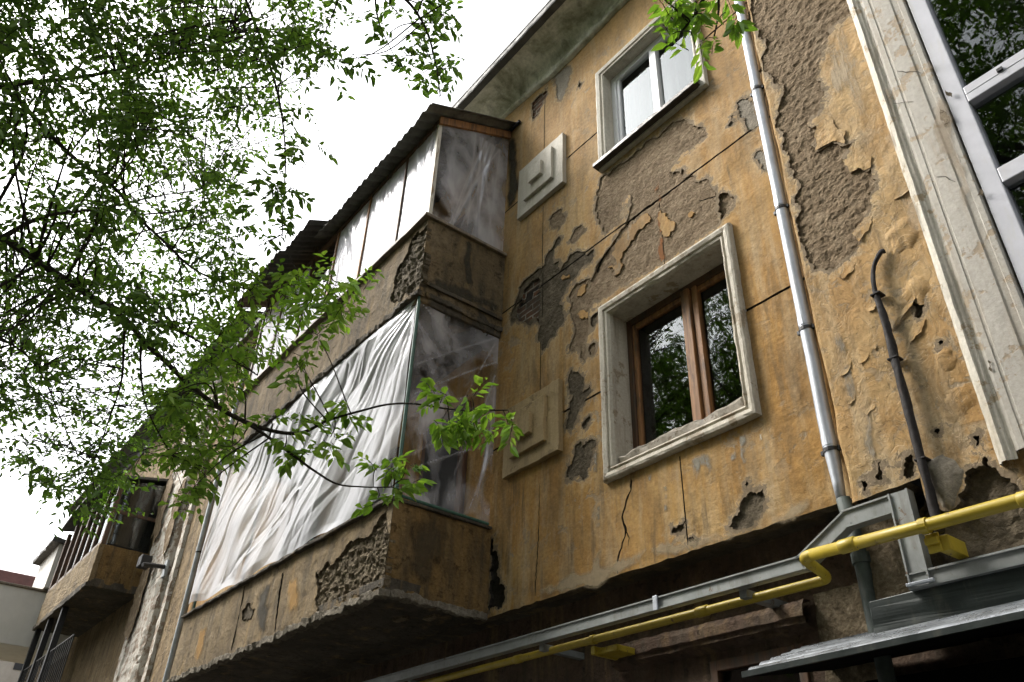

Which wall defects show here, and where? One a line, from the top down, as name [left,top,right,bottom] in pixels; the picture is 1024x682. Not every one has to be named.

flaking render [532,67,581,119]
flaking render [728,97,759,131]
flaking render [747,0,875,278]
spalling [390,225,432,303]
flaking render [511,119,735,360]
flaking render [565,370,597,480]
spalling [315,503,395,611]
flaking render [488,539,505,611]
crack [617,479,632,574]
flaking render [729,481,765,530]
flaking render [919,436,1021,518]
flaking render [924,508,1024,567]